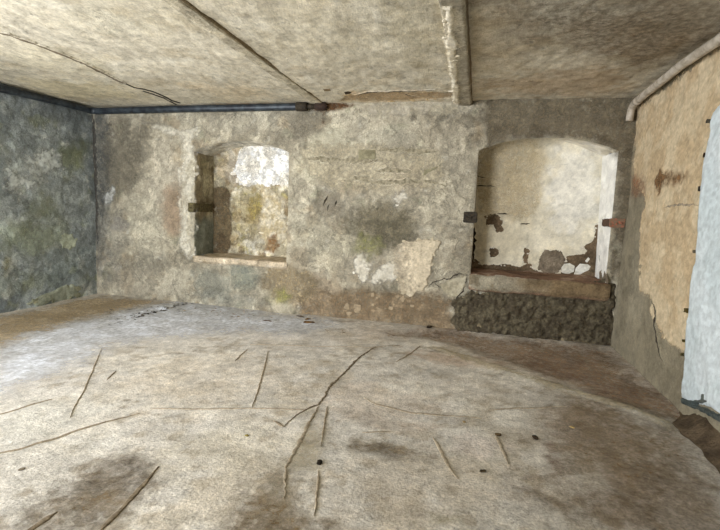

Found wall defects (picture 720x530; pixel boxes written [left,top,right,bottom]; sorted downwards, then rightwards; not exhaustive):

crack [0,31,126,84]
corrosion [312,103,353,123]
corrosion [655,170,685,195]
leakage [352,203,411,254]
peeling [484,213,504,233]
flaking render [262,225,616,346]
crack [429,226,479,303]
crack [651,301,665,366]
crack [0,344,420,499]
crack [100,466,159,530]
crack [313,471,321,514]